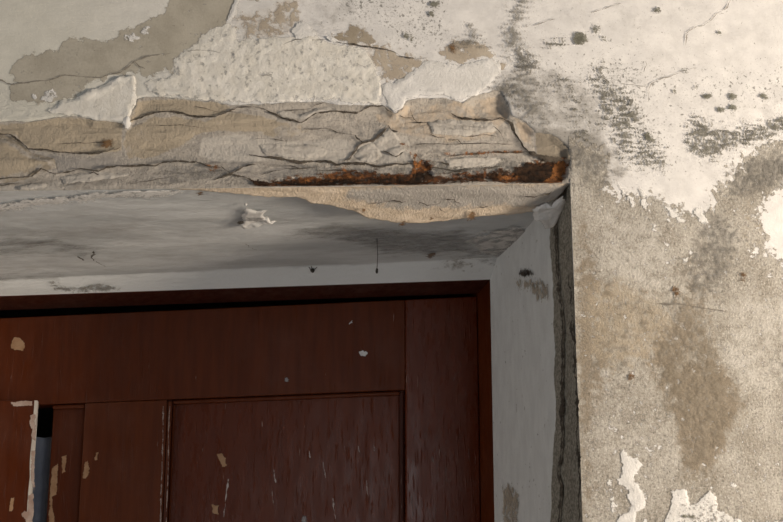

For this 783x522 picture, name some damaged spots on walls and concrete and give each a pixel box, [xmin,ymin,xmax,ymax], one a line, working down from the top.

crack [0,50,216,85]
crack [0,102,563,186]
flaking render [0,0,571,229]
corrosion [250,143,569,186]
crack [373,199,488,212]
leakage [488,0,673,184]
leakage [685,93,783,195]
peeling [569,132,783,522]